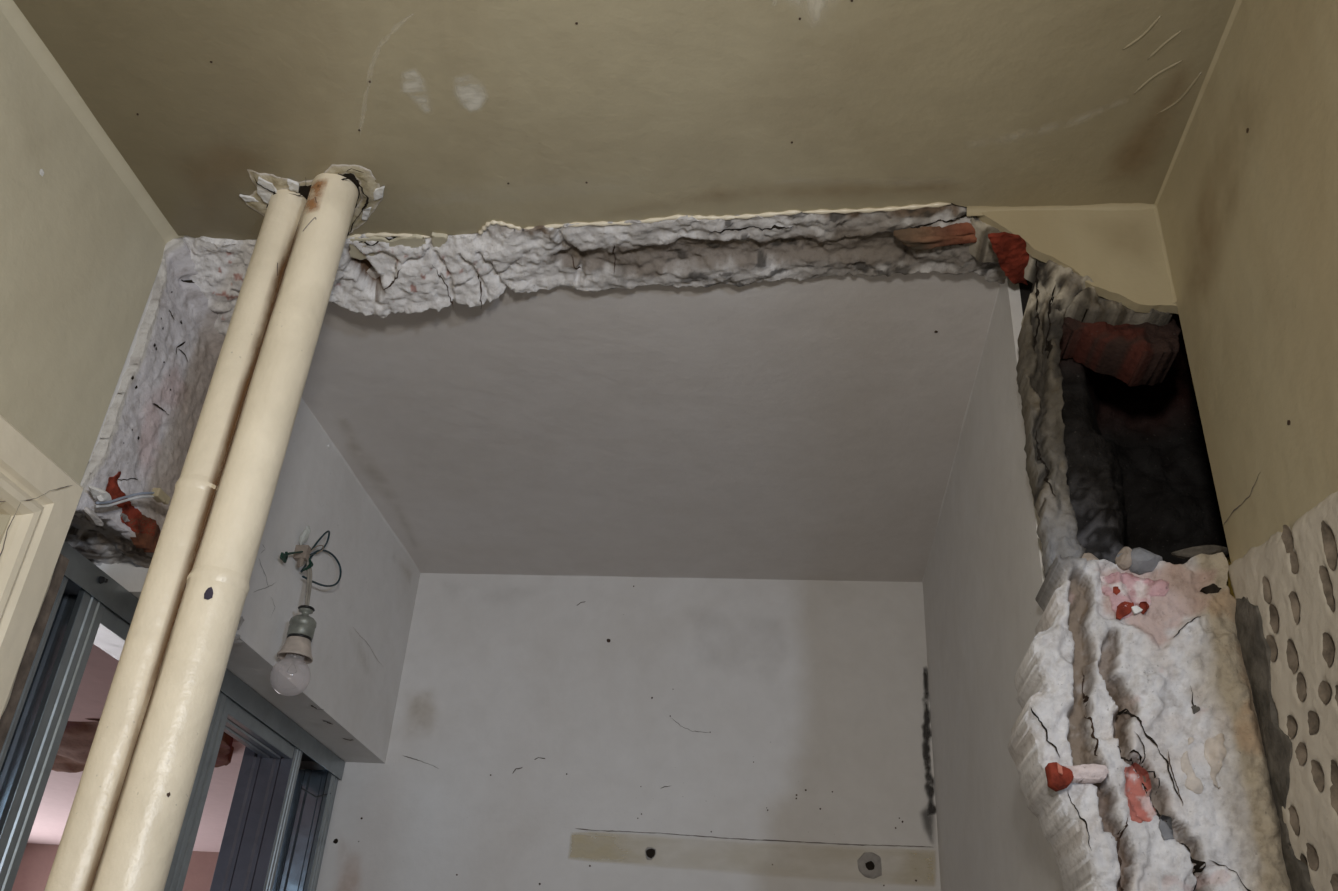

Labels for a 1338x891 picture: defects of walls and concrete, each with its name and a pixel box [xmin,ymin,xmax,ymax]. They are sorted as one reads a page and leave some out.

spalling [239,164,448,260]
flaking render [65,238,225,568]
spalling [969,216,1181,578]
flaking render [1100,572,1169,620]
spalling [233,616,244,644]
crack [1031,708,1060,757]
flaking render [1124,763,1157,823]
crack [1068,675,1251,891]
peeling [1181,733,1227,794]